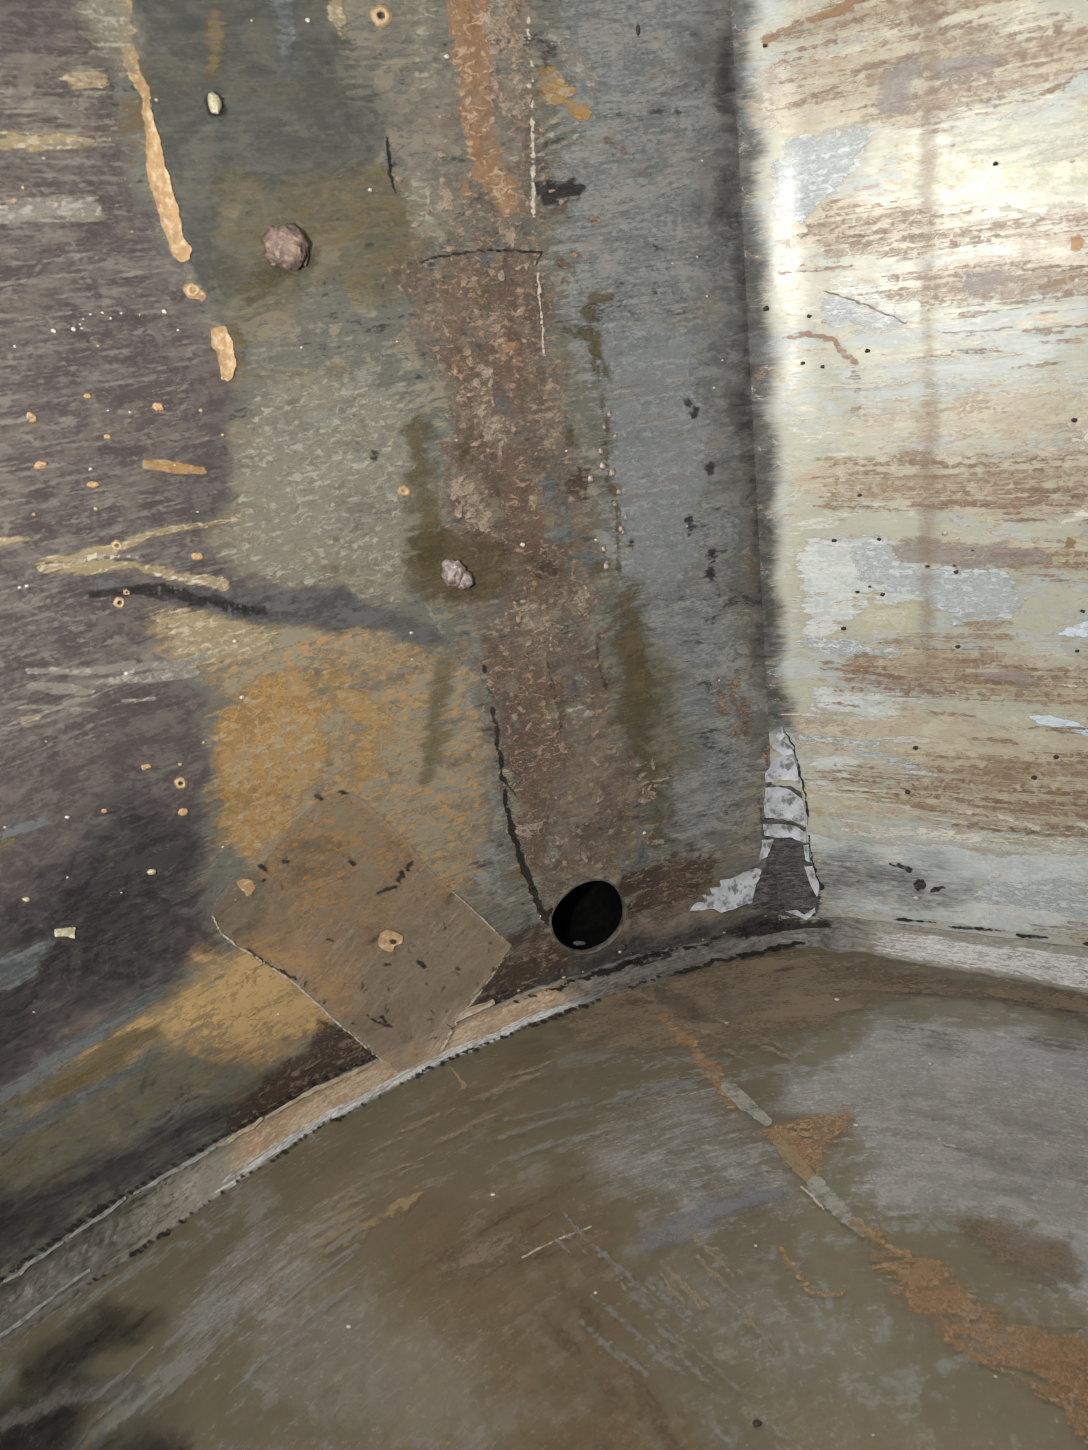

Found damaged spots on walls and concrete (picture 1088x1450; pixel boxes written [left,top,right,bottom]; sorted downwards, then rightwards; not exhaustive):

rust [74,0,192,262]
rust [183,284,206,301]
rust [211,324,247,381]
crack [421,17,546,356]
rust [382,0,650,911]
crack [482,665,553,927]
peeling [689,727,825,920]
rust [658,1013,1088,1444]